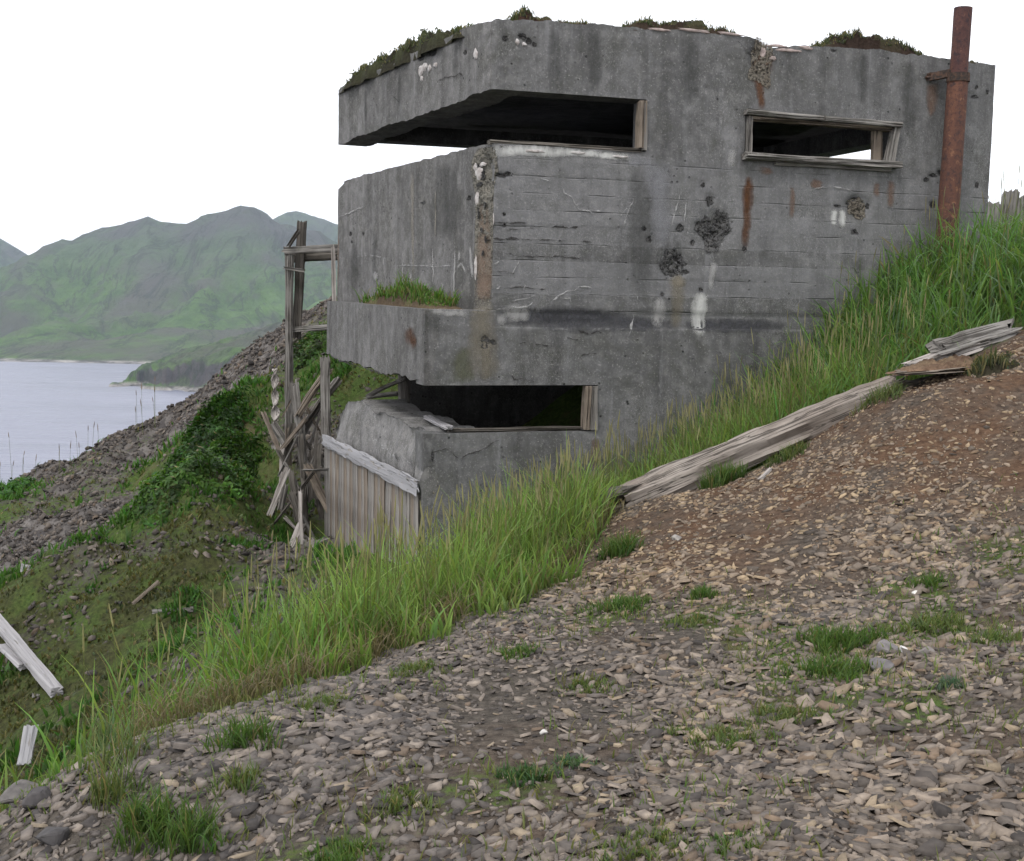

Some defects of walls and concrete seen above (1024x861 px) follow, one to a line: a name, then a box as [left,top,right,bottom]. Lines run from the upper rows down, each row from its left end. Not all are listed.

spalling [648,28,813,89]
corrosion [755,80,764,105]
spalling [466,146,628,312]
spalling [676,183,732,254]
corrosion [743,179,753,242]
water stain [831,211,845,226]
spalling [834,197,869,234]
spalling [659,247,689,277]
water stain [498,265,778,333]